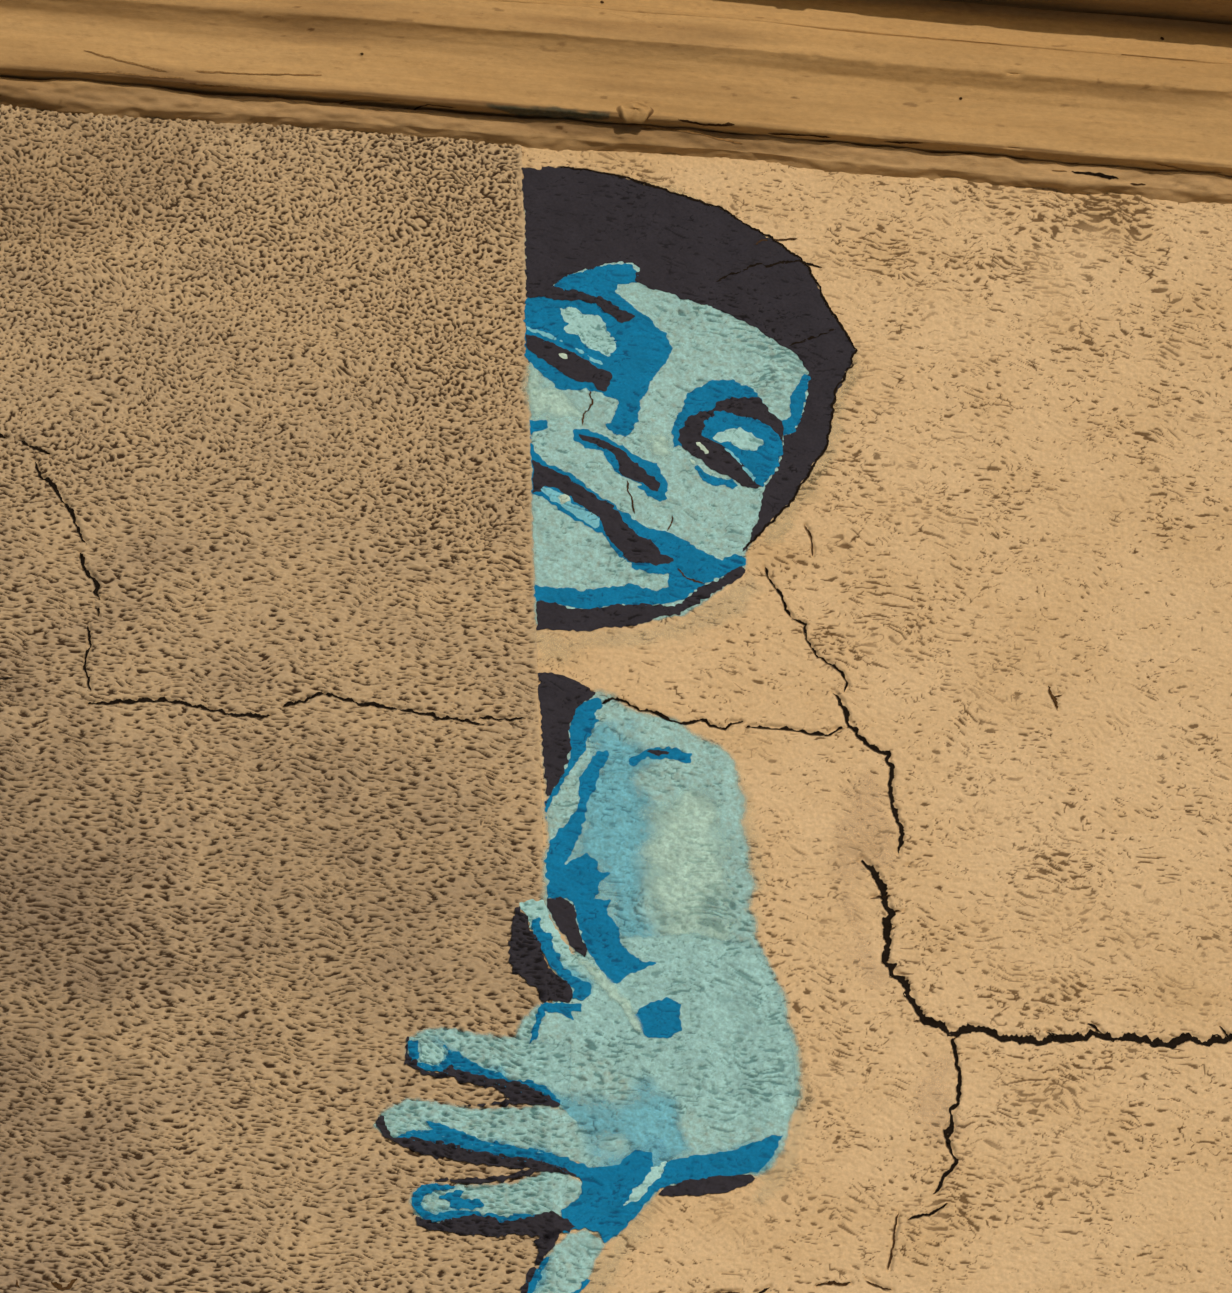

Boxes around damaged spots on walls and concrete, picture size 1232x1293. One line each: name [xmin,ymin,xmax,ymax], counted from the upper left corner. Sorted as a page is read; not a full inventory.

crack [0,433,526,725]
crack [582,391,593,425]
crack [627,481,635,514]
crack [602,567,1232,1290]